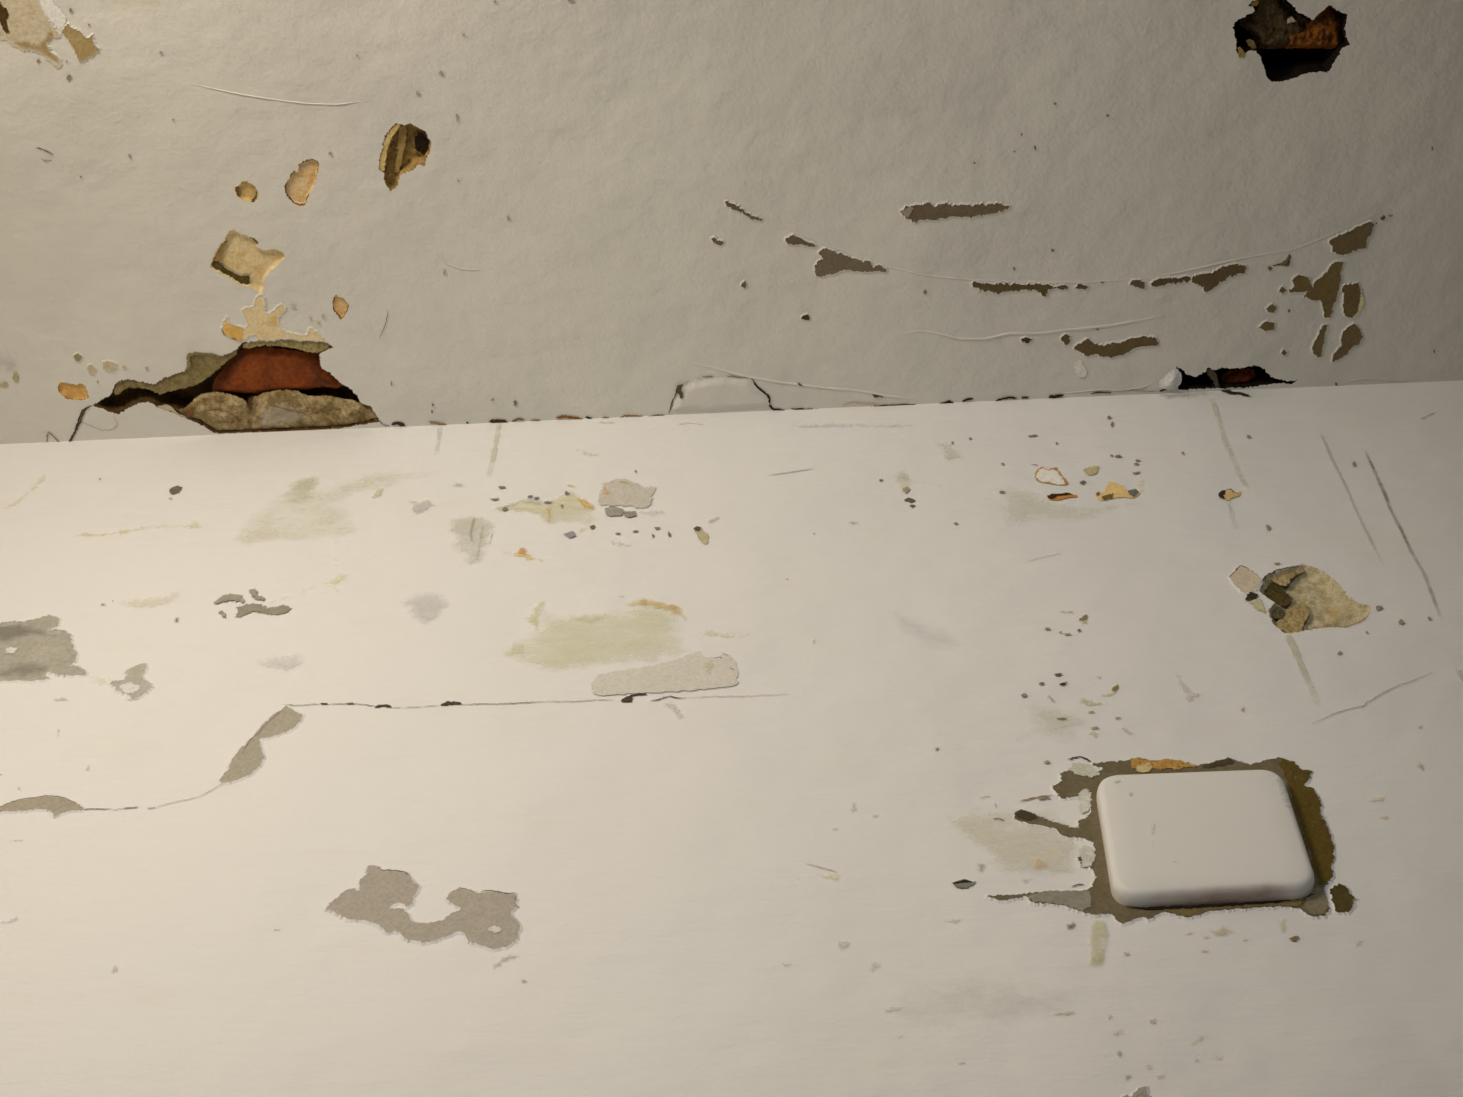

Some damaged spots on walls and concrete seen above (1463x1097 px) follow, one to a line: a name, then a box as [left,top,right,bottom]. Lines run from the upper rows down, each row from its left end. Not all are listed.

peeling [0,0,101,81]
peeling [898,200,1012,225]
peeling [970,267,1105,298]
peeling [1128,261,1249,294]
peeling [1257,215,1393,364]
flaking render [57,229,379,442]
flaking render [1227,562,1383,634]
peeling [0,614,90,684]
crack [283,693,779,708]
crack [84,784,221,810]
flaking render [984,756,1359,952]
peeling [324,864,524,960]